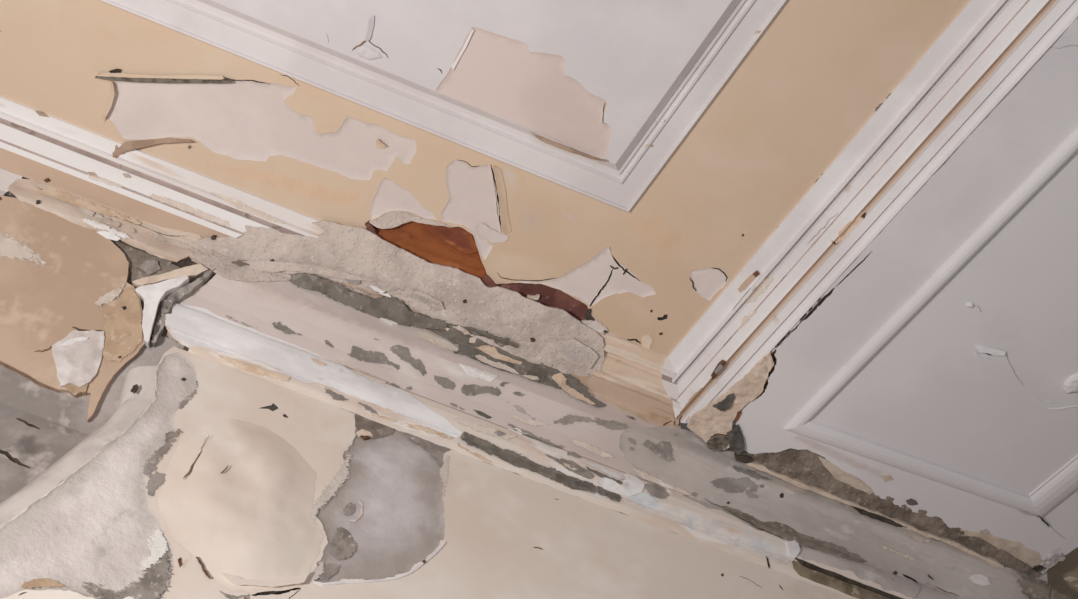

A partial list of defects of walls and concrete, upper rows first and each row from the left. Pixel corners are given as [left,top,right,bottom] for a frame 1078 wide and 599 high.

peeling [95,69,417,180]
peeling [435,26,611,162]
crack [0,450,31,468]
crack [16,418,40,429]
spalling [0,160,1071,599]